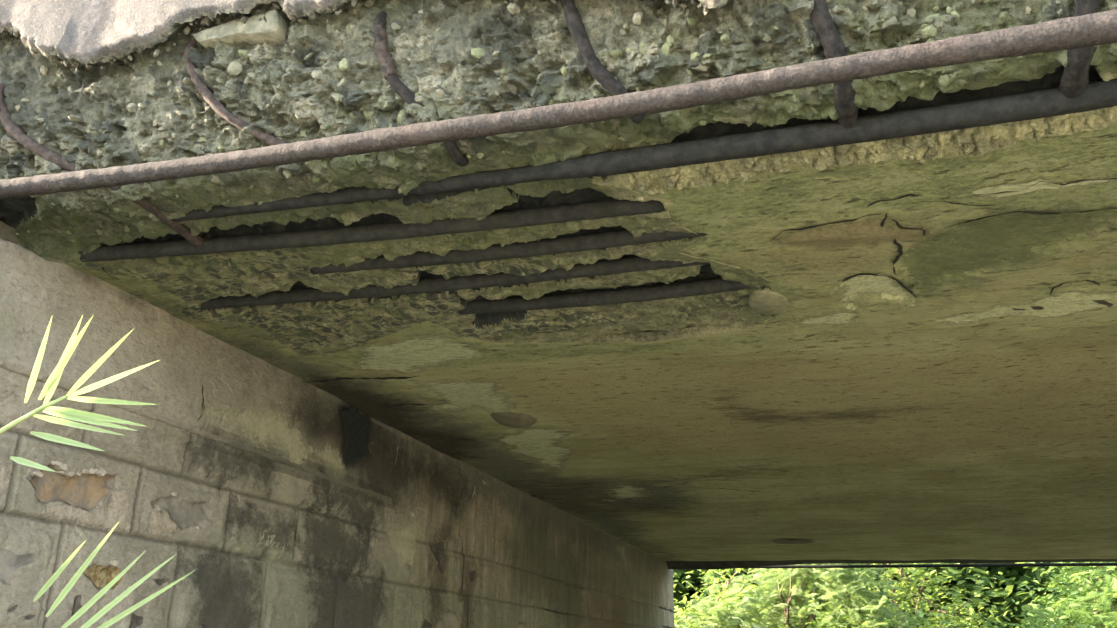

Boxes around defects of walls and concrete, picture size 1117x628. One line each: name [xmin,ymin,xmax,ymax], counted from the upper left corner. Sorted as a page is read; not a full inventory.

spalling [1097,0,1117,13]
spalling [0,0,1074,180]
spalling [1088,43,1117,83]
spalling [0,83,1117,356]
crack [772,178,1117,298]
damp [355,333,515,413]
damp [497,428,571,469]
spalling [26,461,131,532]
spalling [145,491,211,537]
damp [178,379,476,628]
damp [602,483,651,502]
spalling [83,560,122,596]